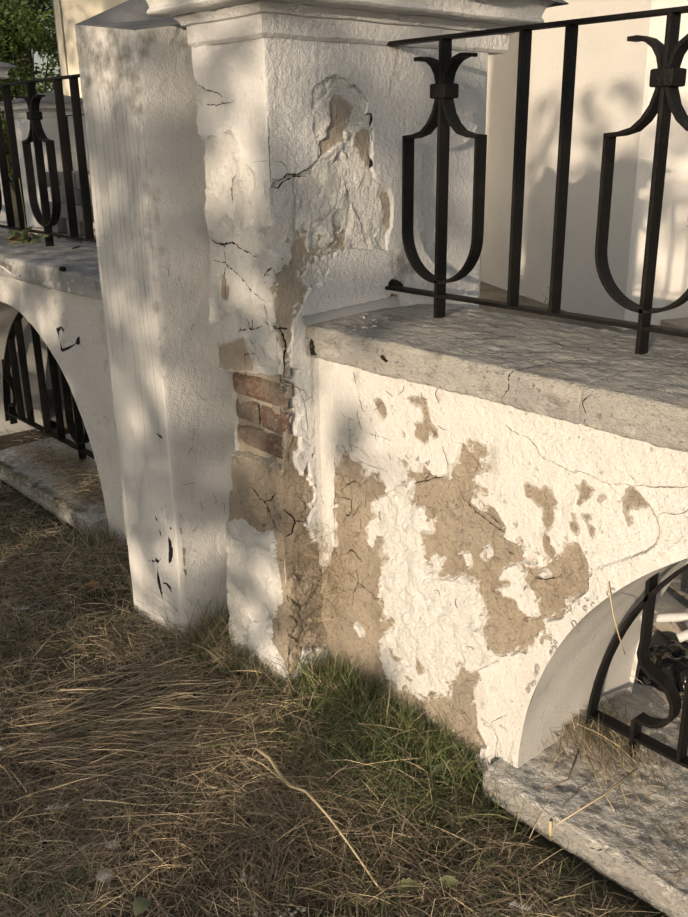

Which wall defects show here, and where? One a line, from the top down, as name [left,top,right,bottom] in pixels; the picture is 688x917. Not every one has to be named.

crack [231,118,316,200]
crack [365,113,397,168]
crack [212,240,308,428]
crack [485,337,655,402]
flaking render [200,75,660,766]